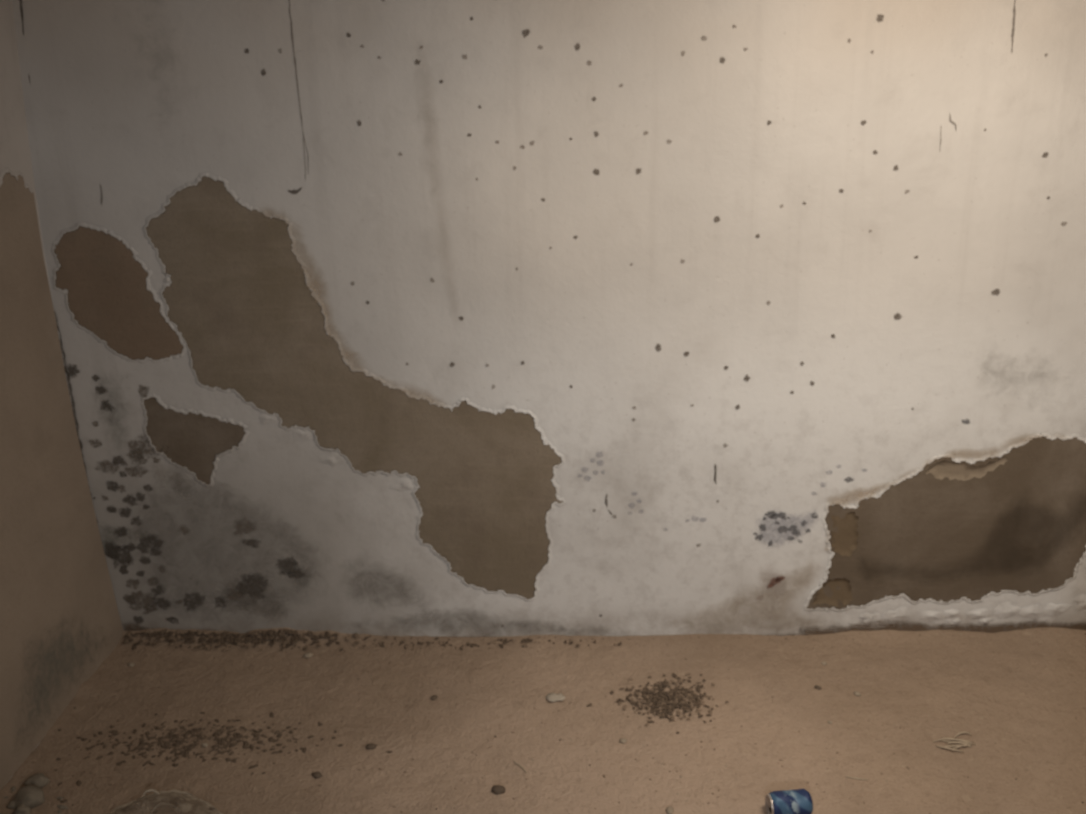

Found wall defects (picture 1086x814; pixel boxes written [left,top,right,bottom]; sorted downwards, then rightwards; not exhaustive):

crack [289,0,309,194]
peeling [0,167,567,790]
water stain [754,511,818,546]
peeling [803,433,1086,612]